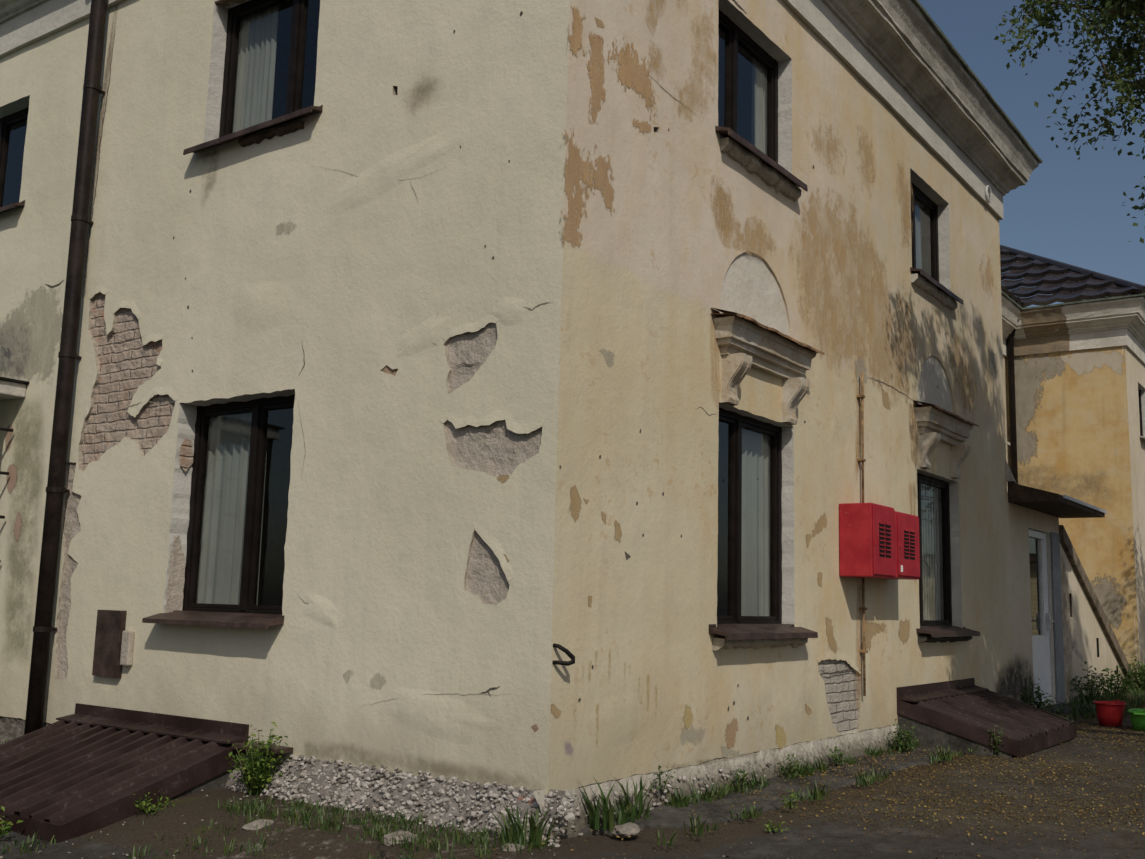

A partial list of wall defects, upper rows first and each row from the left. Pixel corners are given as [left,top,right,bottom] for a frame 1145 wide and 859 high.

peeling [567,5,660,133]
peeling [561,128,615,247]
spalling [442,314,499,394]
spalling [55,285,179,680]
spalling [180,438,193,472]
spalling [438,410,546,483]
spalling [1008,350,1125,469]
spalling [165,536,186,613]
spalling [464,521,514,605]
crack [370,686,516,705]
flaking render [816,617,863,732]
damp [997,662,1034,701]